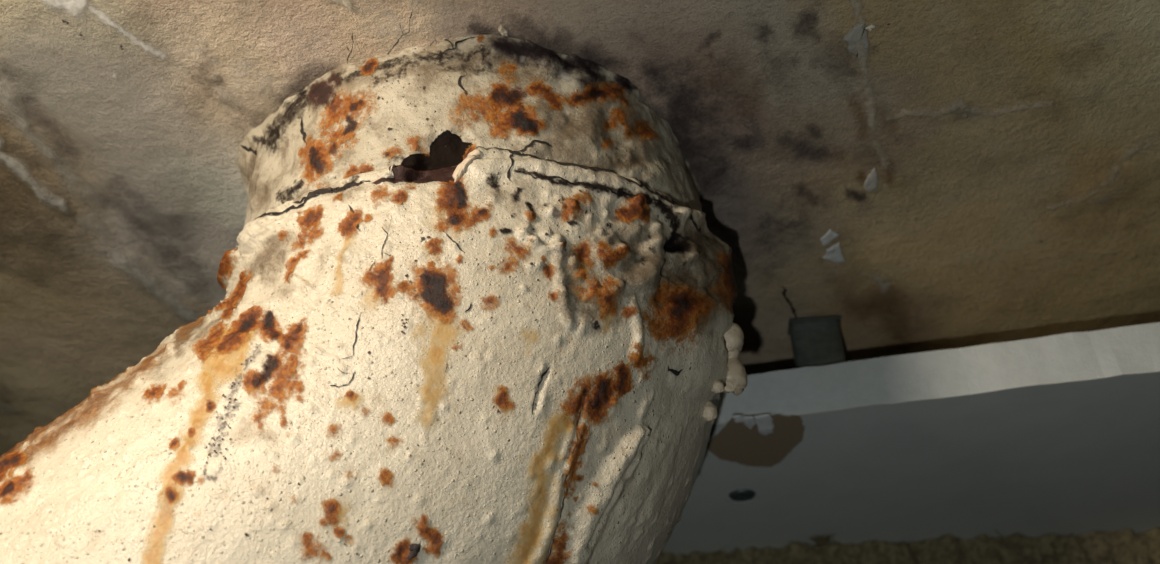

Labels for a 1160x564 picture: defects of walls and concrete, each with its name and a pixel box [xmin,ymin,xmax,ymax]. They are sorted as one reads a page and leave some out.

damp [43,0,165,59]
corrosion [298,89,376,189]
peeling [452,144,481,182]
corrosion [452,61,658,149]
crack [256,180,391,271]
corrosion [278,192,372,293]
crack [476,140,717,309]
corrosion [362,177,558,425]
corrosion [0,344,167,504]
corrosion [142,249,307,564]
corrosion [510,239,717,564]
corrosion [390,514,443,564]